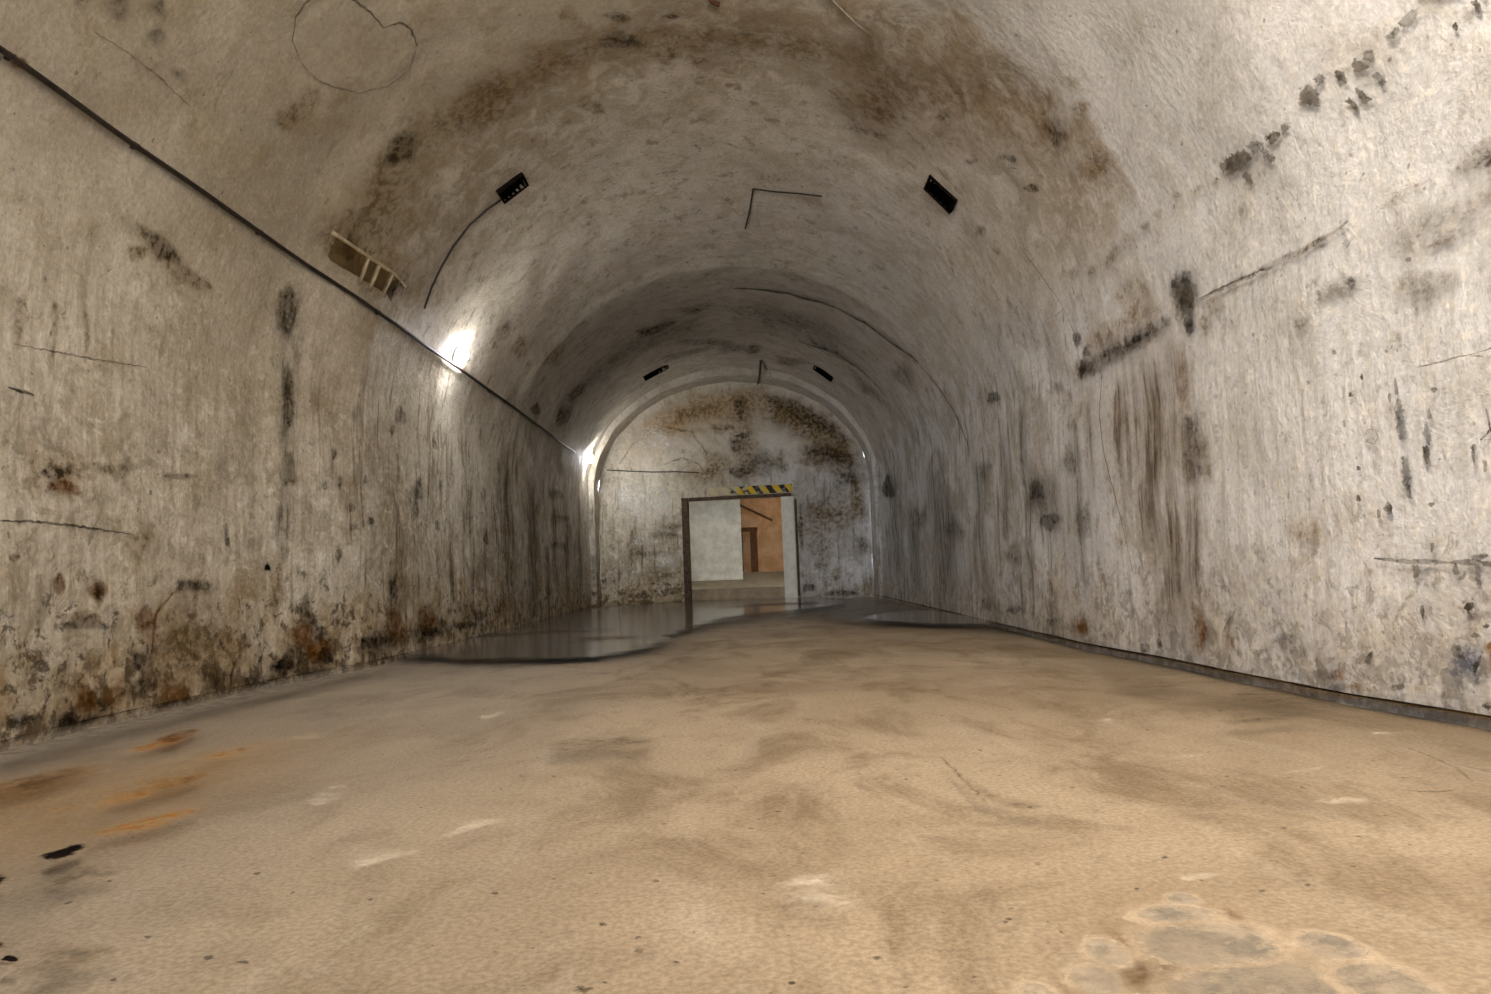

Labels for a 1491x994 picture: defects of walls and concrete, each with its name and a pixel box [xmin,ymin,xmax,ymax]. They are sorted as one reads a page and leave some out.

peeling [1298,10,1418,114]
water stain [346,137,413,230]
peeling [1220,123,1290,184]
water stain [1095,308,1148,358]
water stain [695,411,784,480]
water stain [882,407,1092,589]
water stain [1114,363,1211,605]
water stain [137,580,232,708]